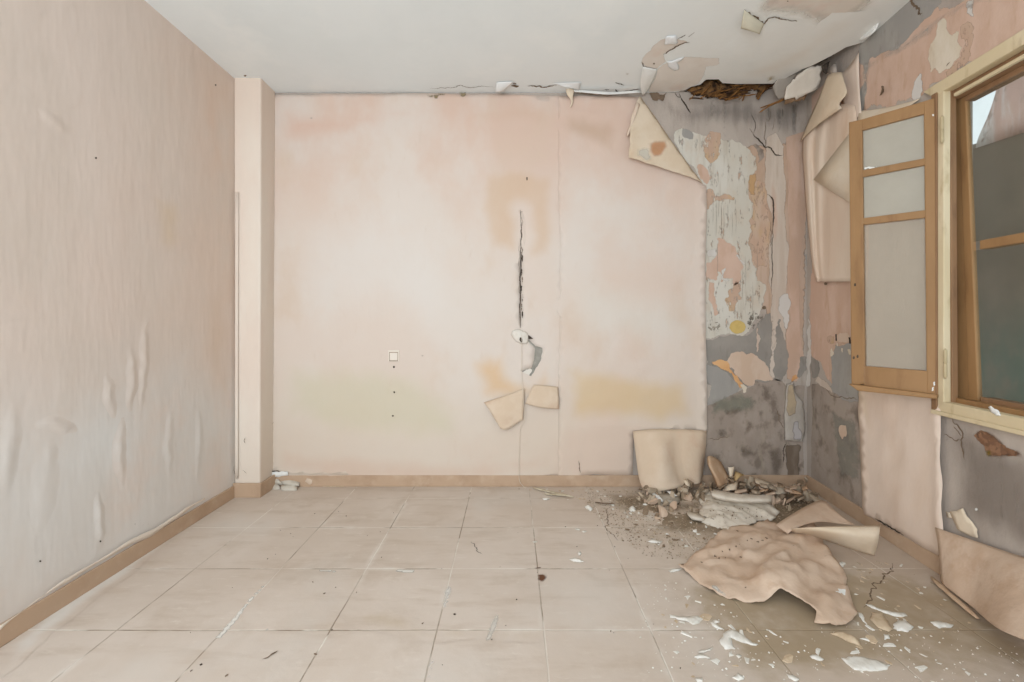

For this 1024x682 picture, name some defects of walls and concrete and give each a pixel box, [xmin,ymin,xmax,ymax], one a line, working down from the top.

crack [744,9,796,24]
peeling [765,0,867,20]
crack [512,34,692,96]
peeling [640,35,784,112]
peeling [812,61,837,112]
crack [516,212,524,328]
peeling [674,128,814,382]
water stain [273,162,863,508]
peeling [712,351,774,393]
crack [864,563,894,607]